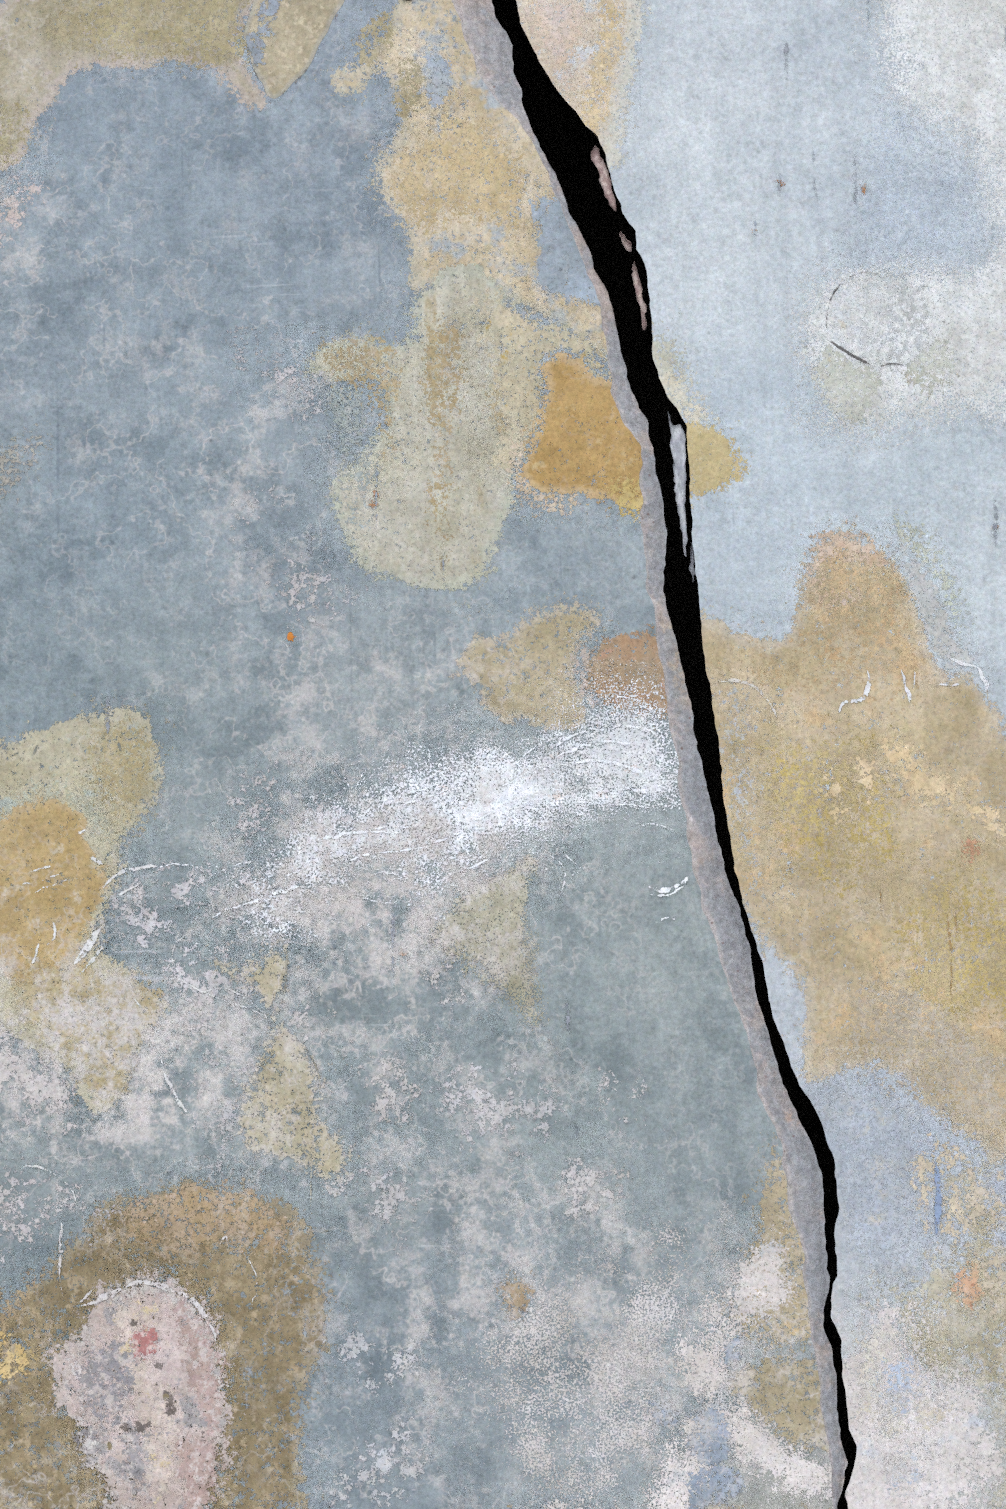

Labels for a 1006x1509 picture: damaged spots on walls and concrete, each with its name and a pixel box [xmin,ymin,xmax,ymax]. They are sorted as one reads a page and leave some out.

leakage [0,161,63,248]
leakage [314,0,612,473]
leakage [221,326,337,430]
leakage [652,321,754,509]
leakage [224,472,371,642]
crack [452,0,857,1509]
leakage [0,508,1006,1509]